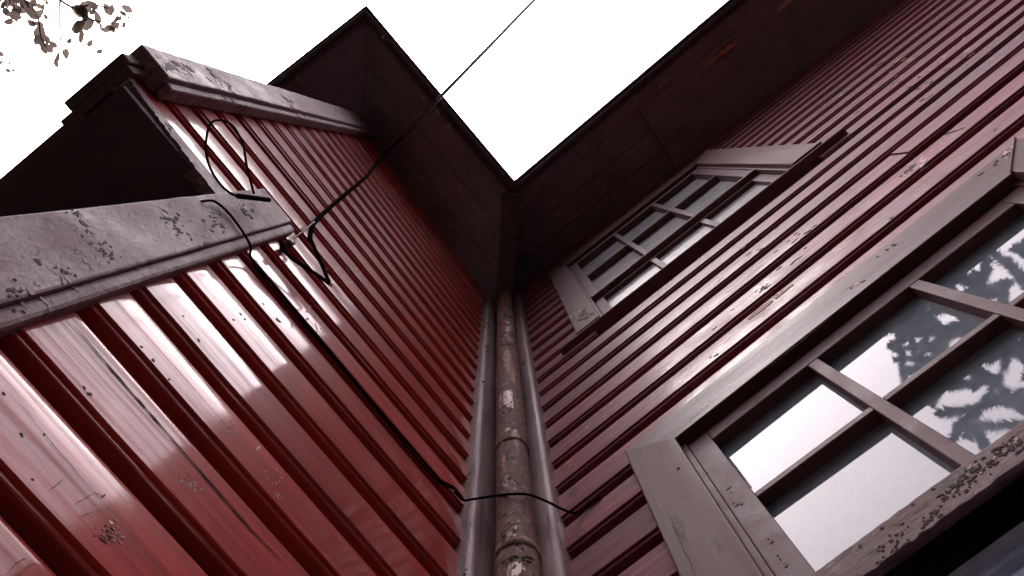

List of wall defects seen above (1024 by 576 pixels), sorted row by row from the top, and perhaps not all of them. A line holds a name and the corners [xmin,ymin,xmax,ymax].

peeling [156,54,237,103]
peeling [278,87,307,119]
peeling [65,209,122,270]
peeling [159,205,226,245]
peeling [7,278,52,313]
peeling [34,258,79,291]
peeling [499,390,527,492]
peeling [875,436,1024,565]
peeling [500,511,534,576]